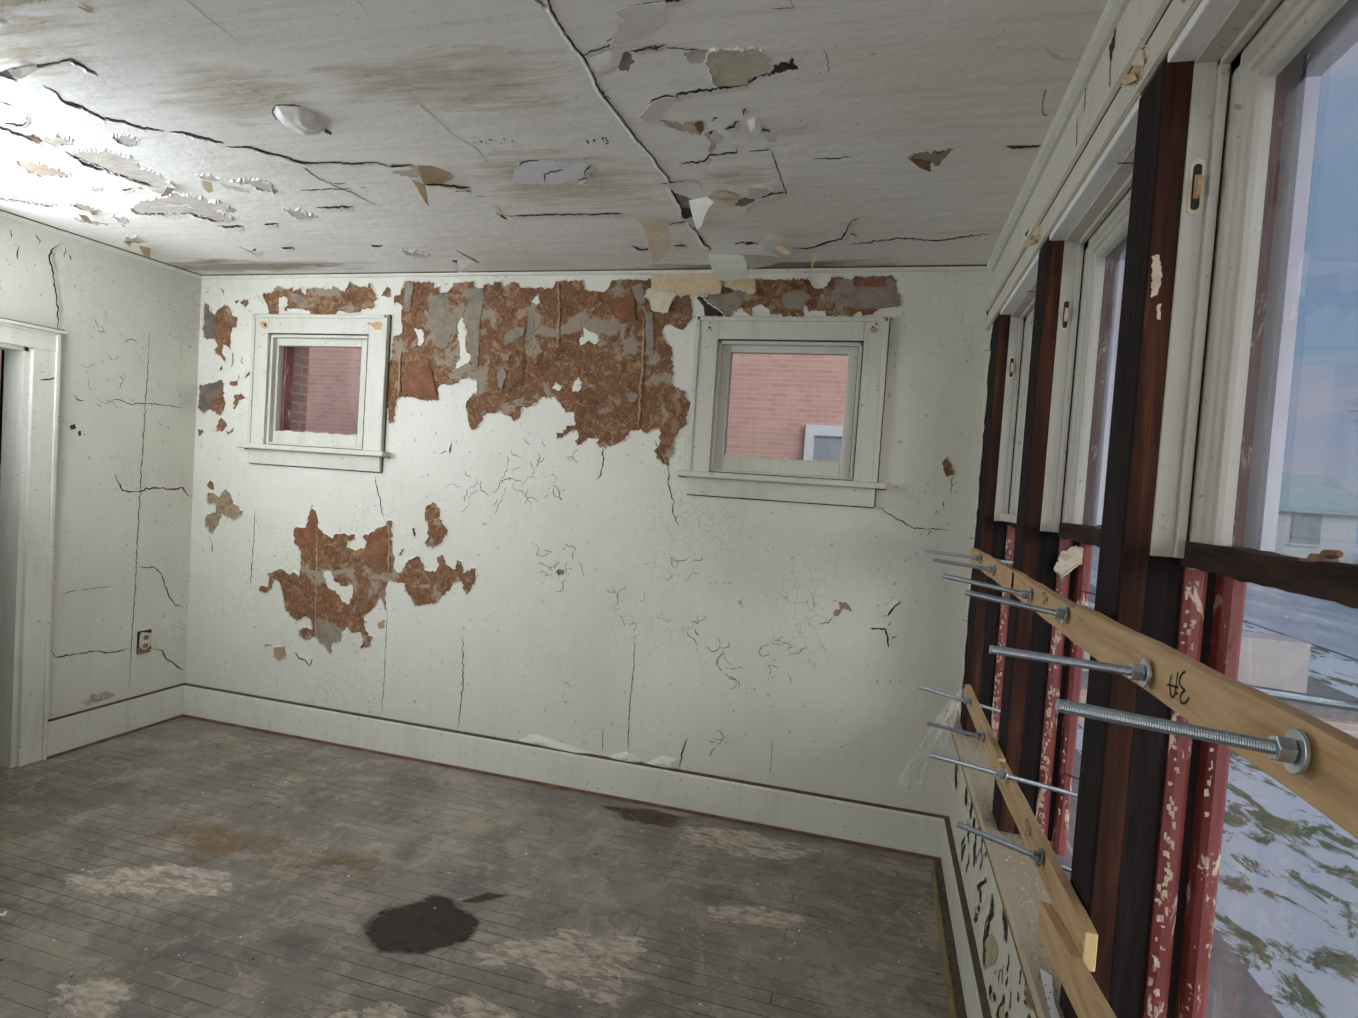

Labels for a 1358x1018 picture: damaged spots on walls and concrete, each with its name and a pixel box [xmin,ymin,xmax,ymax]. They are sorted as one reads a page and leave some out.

peeling [0,0,51,27]
crack [0,58,687,255]
crack [532,0,787,194]
peeling [586,44,798,153]
crack [10,230,72,330]
peeling [197,181,903,468]
crack [42,321,193,687]
peeling [204,481,244,552]
peeling [258,500,478,667]
crack [439,438,604,512]
crack [531,542,703,750]
damp [365,892,509,953]